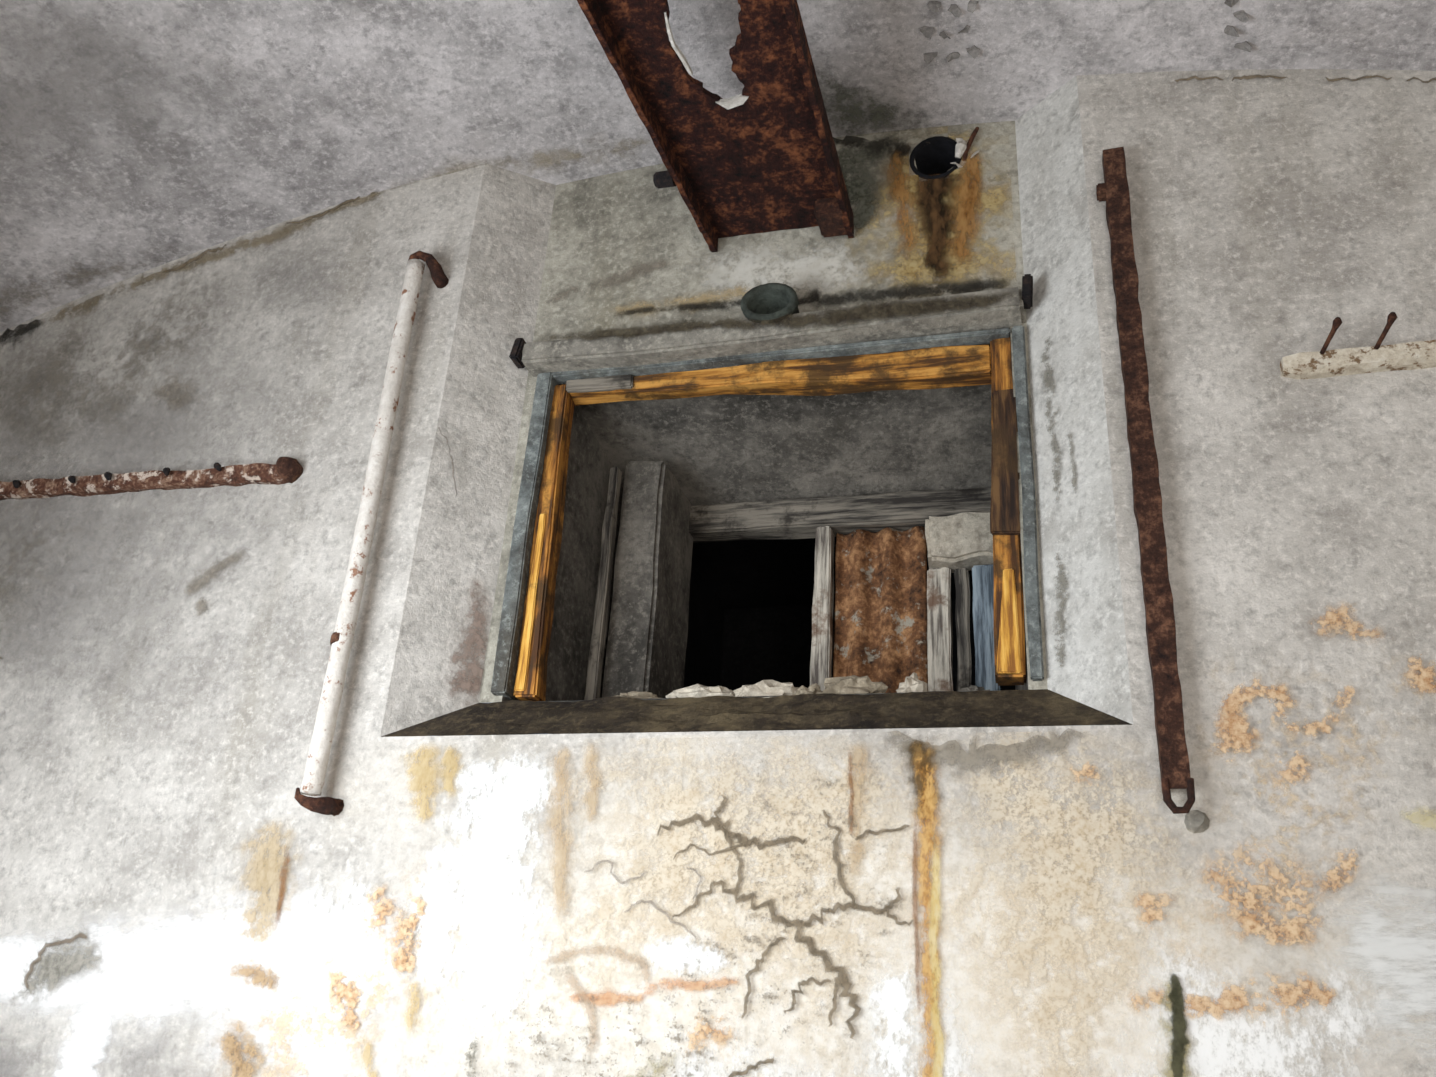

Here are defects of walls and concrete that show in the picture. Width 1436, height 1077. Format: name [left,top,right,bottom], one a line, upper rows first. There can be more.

rust [867,136,1013,285]
water stain [0,284,44,342]
water stain [551,261,666,302]
water stain [550,280,1009,341]
rust [242,825,288,941]
crack [585,795,913,1039]
rust [908,741,943,1077]
peeling [23,932,100,996]
rust [232,965,277,988]
rust [570,978,736,1006]
rust [688,1016,731,1052]
crack [729,1058,774,1077]